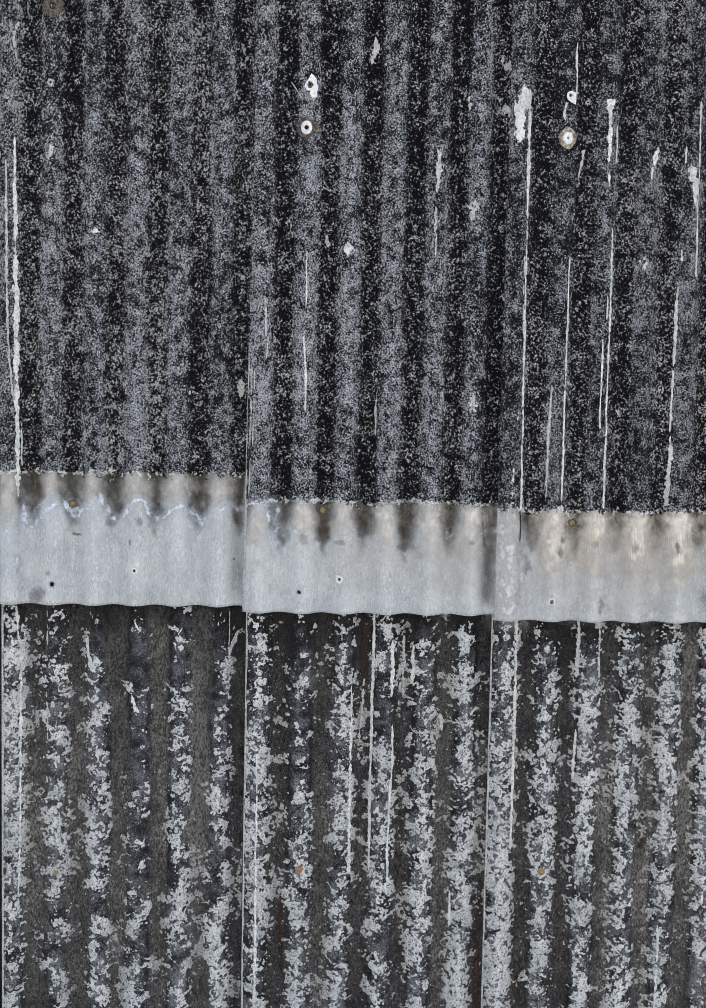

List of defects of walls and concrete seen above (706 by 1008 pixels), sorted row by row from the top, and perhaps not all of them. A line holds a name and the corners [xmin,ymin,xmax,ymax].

damp [2,137,416,556]
damp [421,84,706,1008]
peeling [2,605,706,1008]